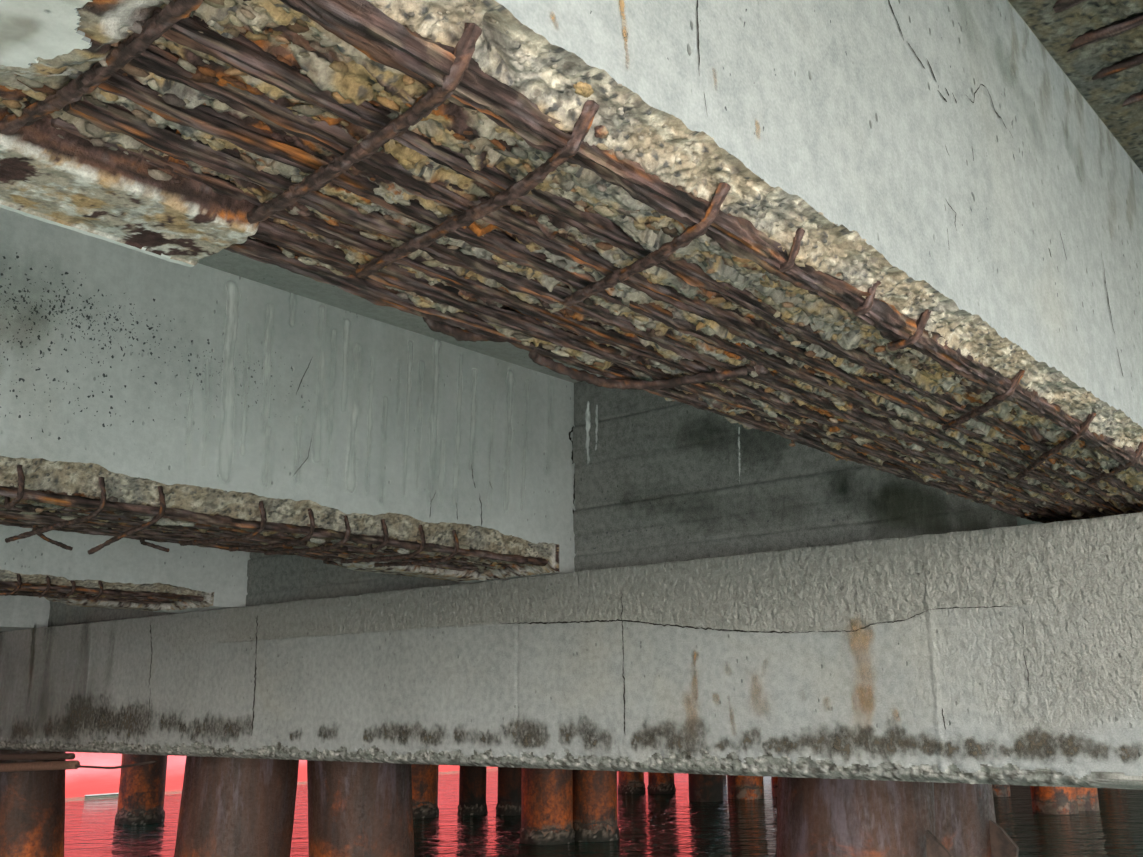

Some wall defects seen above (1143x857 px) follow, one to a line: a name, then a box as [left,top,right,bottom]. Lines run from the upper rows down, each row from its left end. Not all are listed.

rust [619,0,627,59]
crack [697,0,708,117]
crack [888,0,1011,134]
spalling [0,0,1143,522]
spalling [0,456,559,582]
spalling [0,569,214,611]
crack [501,592,1029,733]